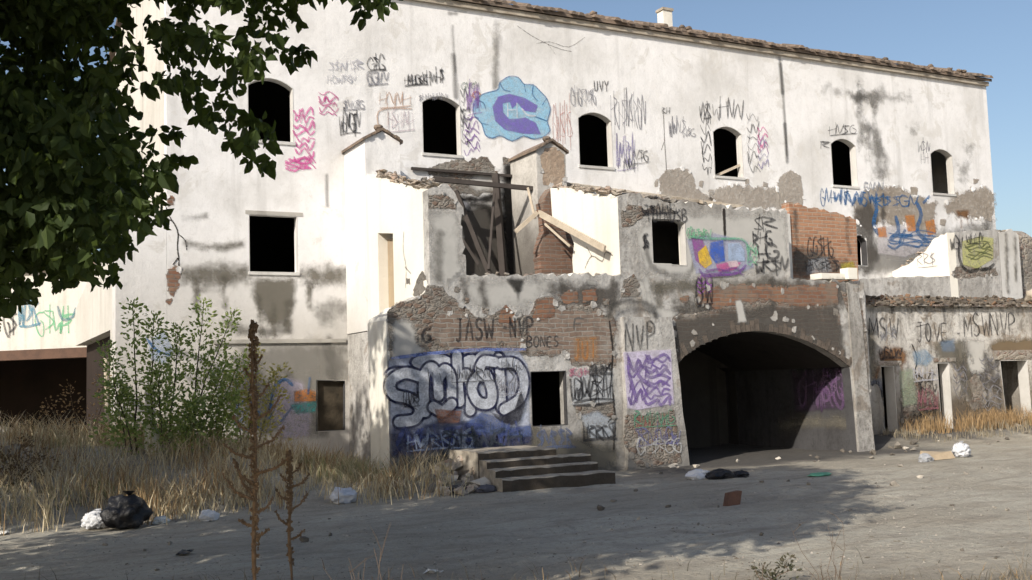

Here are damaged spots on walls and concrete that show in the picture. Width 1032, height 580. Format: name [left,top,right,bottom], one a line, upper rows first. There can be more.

damp [852,94,884,158]
spalling [540,147,568,188]
spalling [854,179,996,235]
spalling [166,265,181,305]
damp [182,265,345,335]
flaking render [387,156,871,393]
spalling [574,400,682,468]